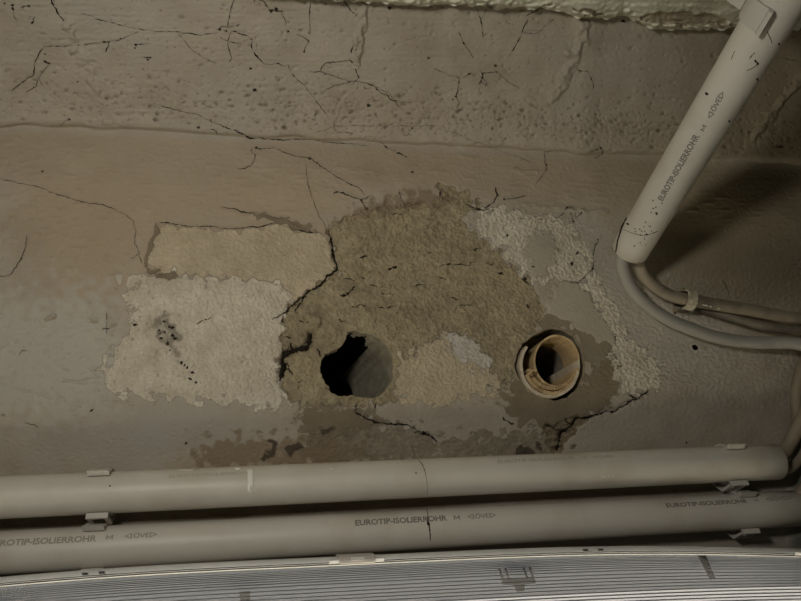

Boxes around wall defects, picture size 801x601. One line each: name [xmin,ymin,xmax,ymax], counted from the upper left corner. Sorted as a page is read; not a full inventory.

crack [82,13,532,163]
peeling [144,224,178,280]
spalling [275,183,547,410]
crack [355,402,437,442]
spalling [541,412,590,453]
crack [545,391,648,451]